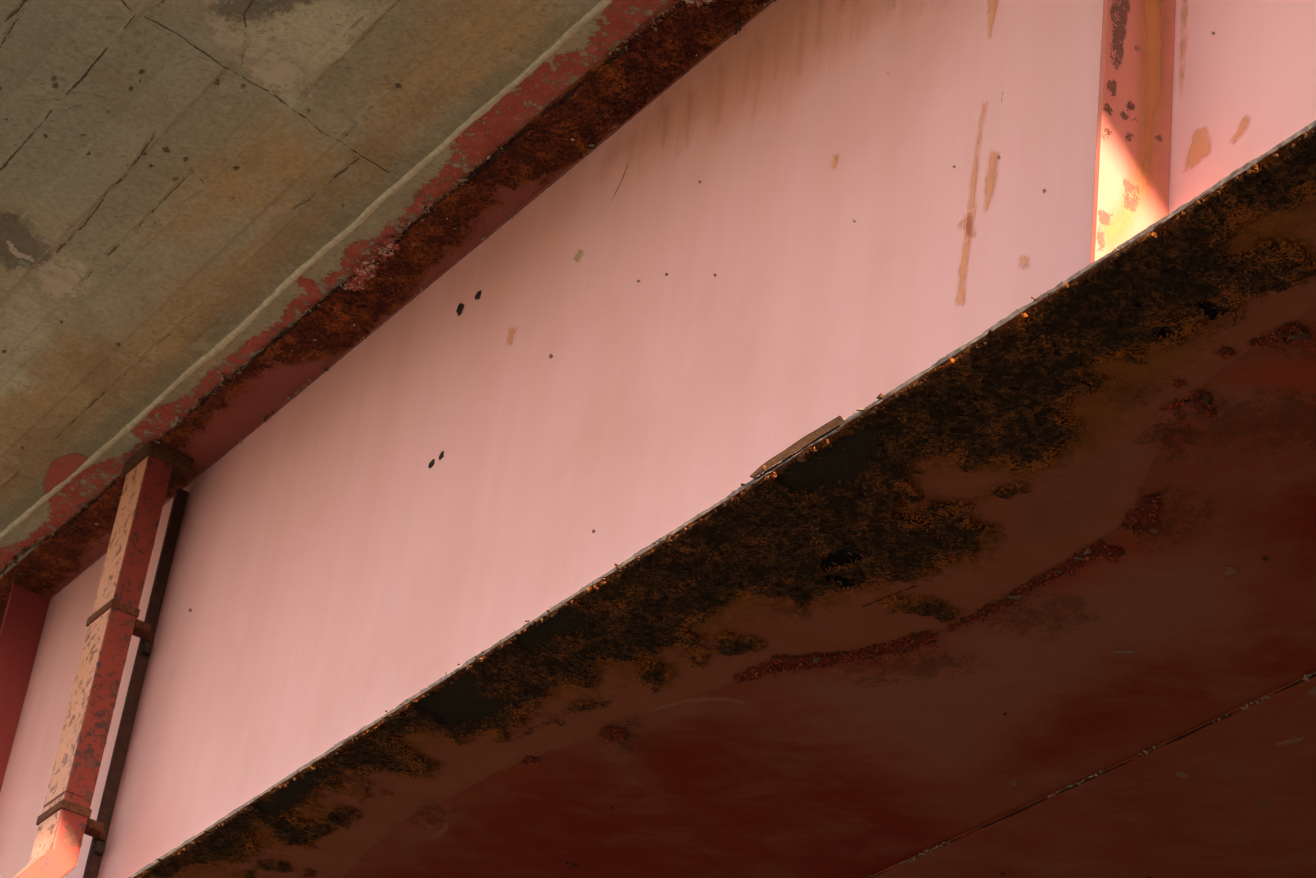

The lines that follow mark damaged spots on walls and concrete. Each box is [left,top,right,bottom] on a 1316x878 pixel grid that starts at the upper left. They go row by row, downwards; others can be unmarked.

crack [55,131,157,253]
crack [72,170,203,291]
crack [0,0,389,210]
peeling [0,0,718,572]
crack [138,0,686,451]
rust [160,0,769,501]
rust [1102,0,1140,142]
rust [1233,117,1248,140]
crack [0,479,116,575]
rust [0,475,126,630]
rust [136,128,1316,878]
peeling [83,680,118,803]